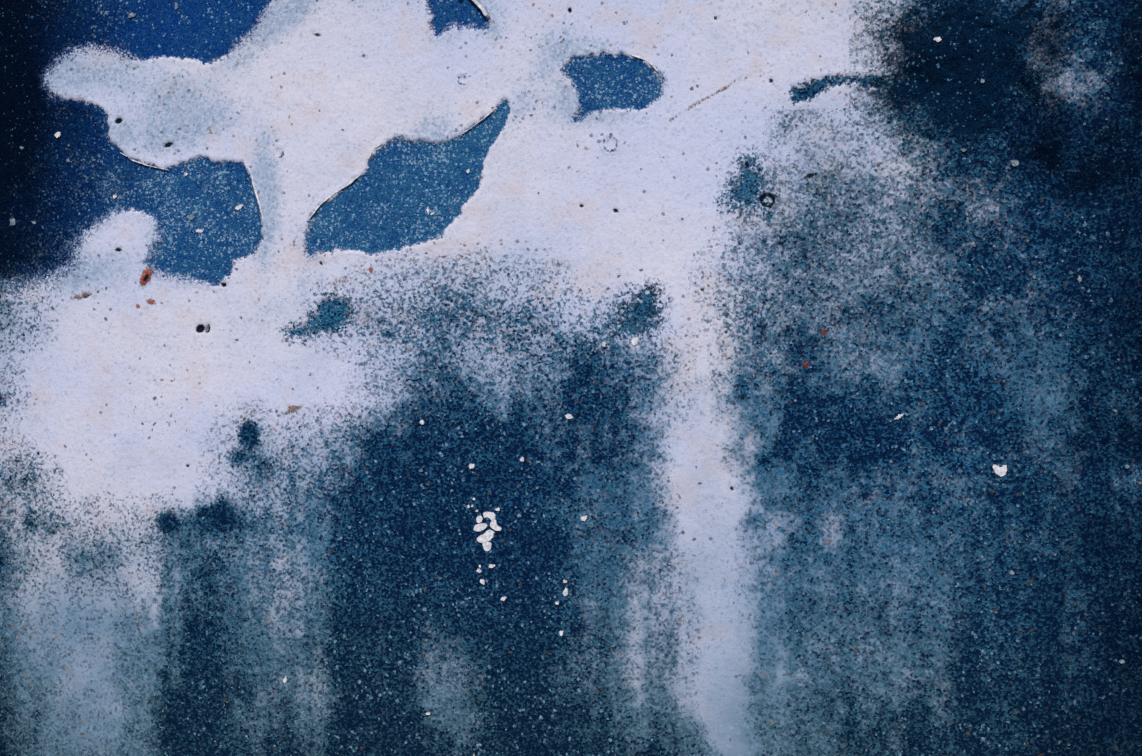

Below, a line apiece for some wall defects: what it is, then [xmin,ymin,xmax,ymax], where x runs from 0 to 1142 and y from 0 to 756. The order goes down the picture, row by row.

peeling [426,0,491,38]
peeling [562,51,667,122]
peeling [789,74,888,104]
peeling [0,0,272,294]
peeling [304,99,510,264]
peeling [467,498,502,585]